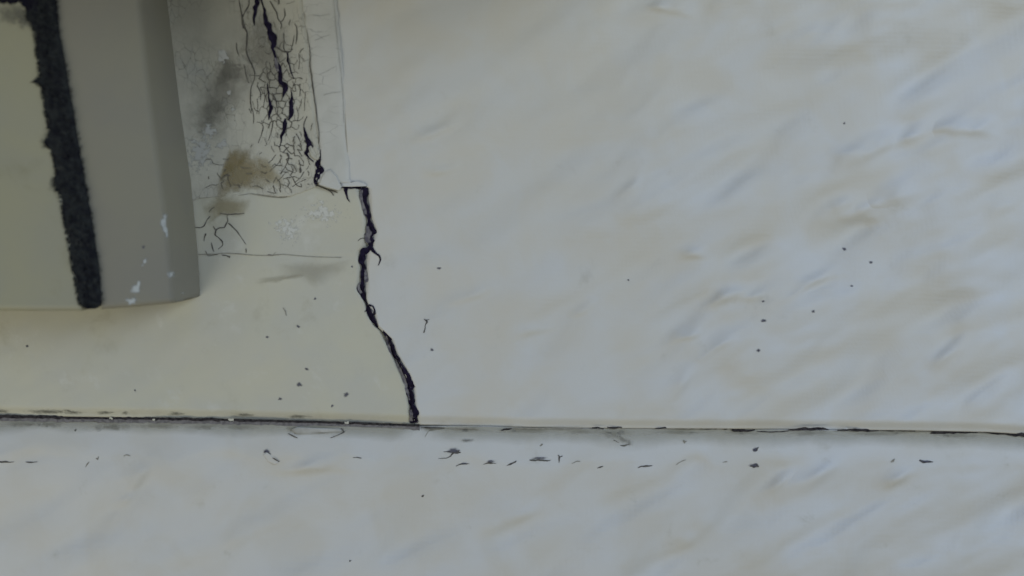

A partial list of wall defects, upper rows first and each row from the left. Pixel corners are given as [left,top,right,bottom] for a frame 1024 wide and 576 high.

crack [195,0,419,423]